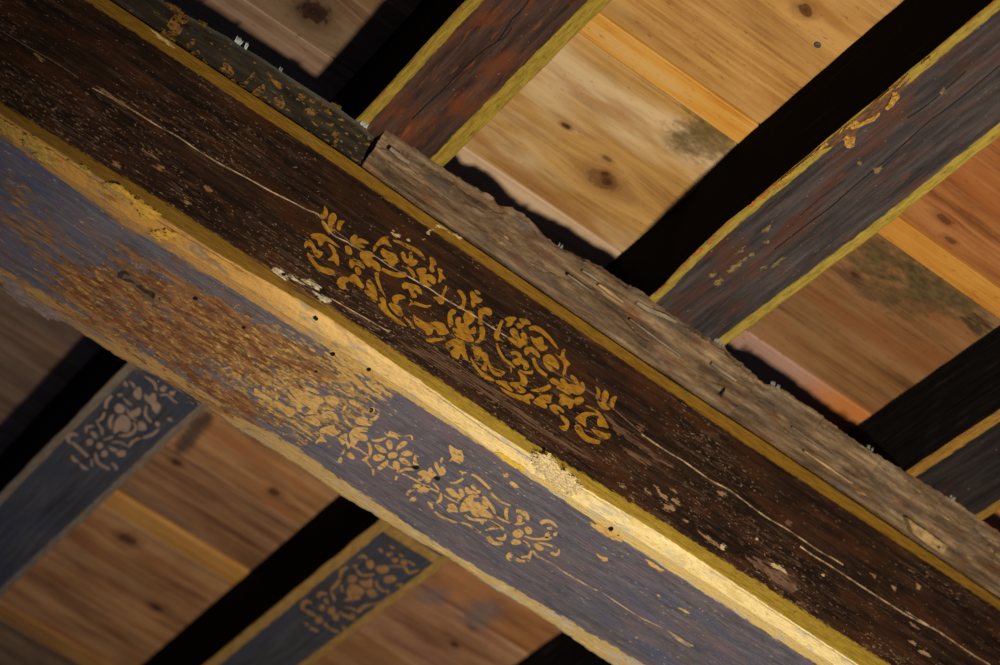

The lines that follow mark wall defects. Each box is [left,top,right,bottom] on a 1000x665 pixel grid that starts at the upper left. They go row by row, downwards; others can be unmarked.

crack [412,0,529,120]
peeling [0,119,91,174]
crack [0,30,507,337]
water stain [673,115,731,155]
peeling [0,170,395,454]
spalling [495,451,584,497]
crack [530,371,990,665]